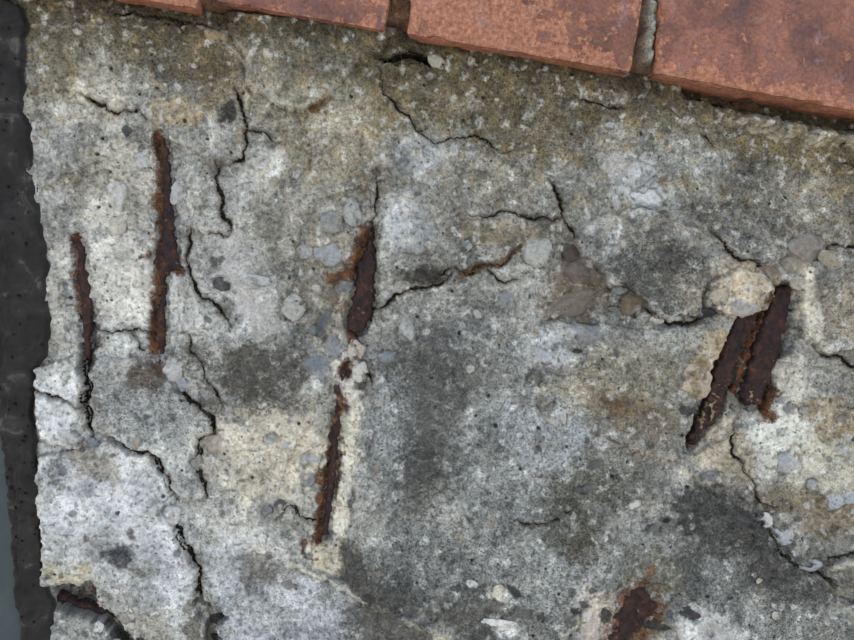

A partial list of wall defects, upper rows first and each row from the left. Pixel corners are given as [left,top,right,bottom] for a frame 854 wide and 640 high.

rust [68,233,95,359]
crack [40,357,178,498]
spalling [33,140,228,640]
rust [138,131,185,372]
crack [174,524,203,596]
crack [182,335,223,496]
crack [185,90,273,321]
spalling [262,189,383,580]
rust [300,357,353,561]
rust [326,221,376,343]
spalling [543,157,854,604]
rust [685,285,791,447]